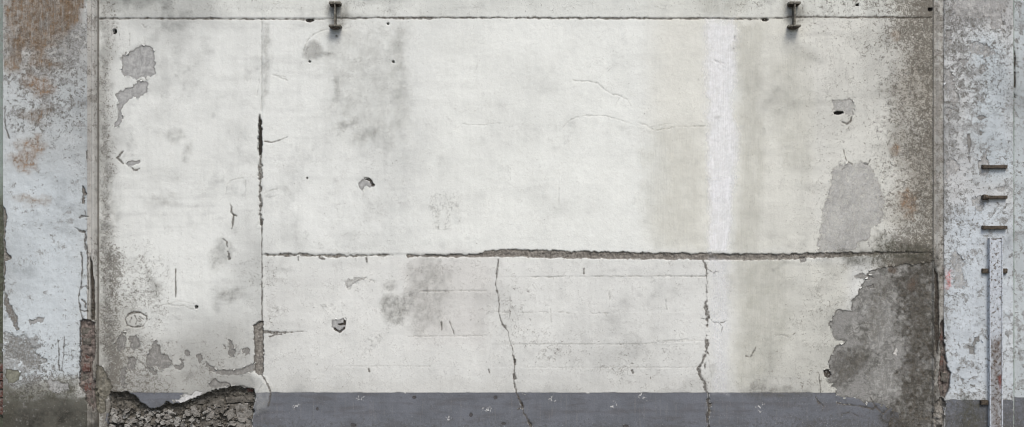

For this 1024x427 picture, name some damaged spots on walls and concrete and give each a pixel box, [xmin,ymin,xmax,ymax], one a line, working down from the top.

rust [4,0,84,95]
peeling [115,43,158,128]
crack [225,115,292,337]
spalling [358,178,375,190]
peeling [817,160,887,254]
spalling [2,208,264,427]
spalling [332,317,346,333]
crack [488,259,532,427]
crack [697,260,725,426]
peeling [823,251,965,427]